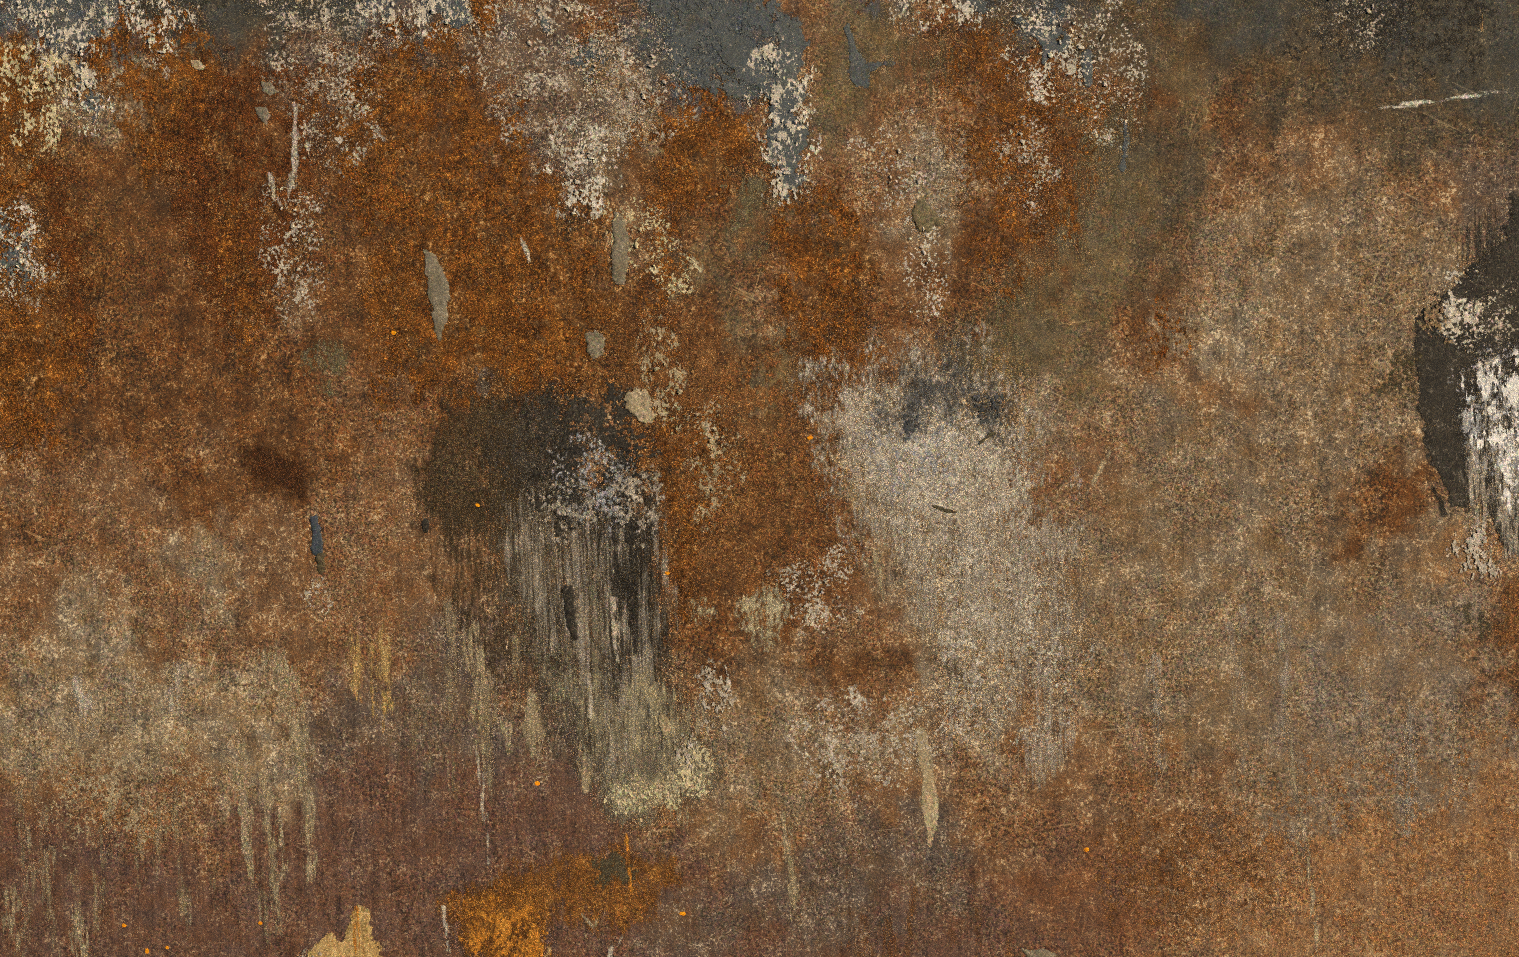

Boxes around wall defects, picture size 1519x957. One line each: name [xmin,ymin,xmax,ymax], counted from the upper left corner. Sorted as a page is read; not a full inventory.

corrosion [0,16,101,470]
peeling [0,0,823,543]
corrosion [78,0,882,622]
peeling [843,23,896,88]
peeling [888,0,1149,223]
corrosion [935,12,1113,308]
damp [1457,202,1514,278]
damp [1432,485,1447,517]
damp [1466,423,1519,561]
damp [463,475,709,809]
corrosion [1076,709,1519,957]